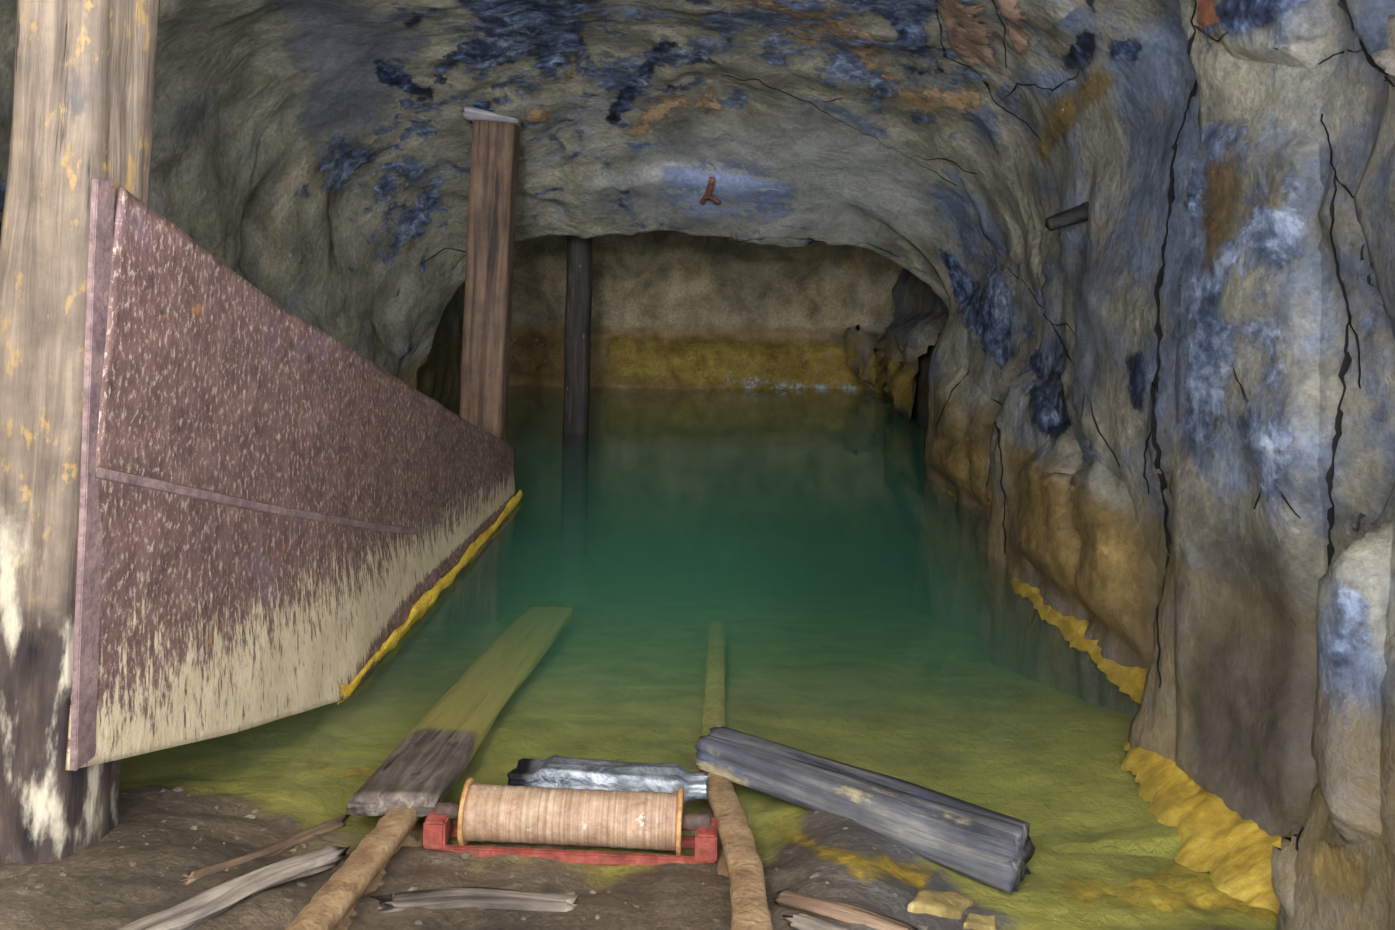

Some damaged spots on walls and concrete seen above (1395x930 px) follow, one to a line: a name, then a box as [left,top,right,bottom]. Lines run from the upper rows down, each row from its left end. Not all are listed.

crack [1007,0,1228,568]
crack [1231,365,1253,425]
crack [1253,114,1361,567]
crack [1155,605,1163,688]
damp [1064,737,1291,921]
crack [1295,827,1304,850]